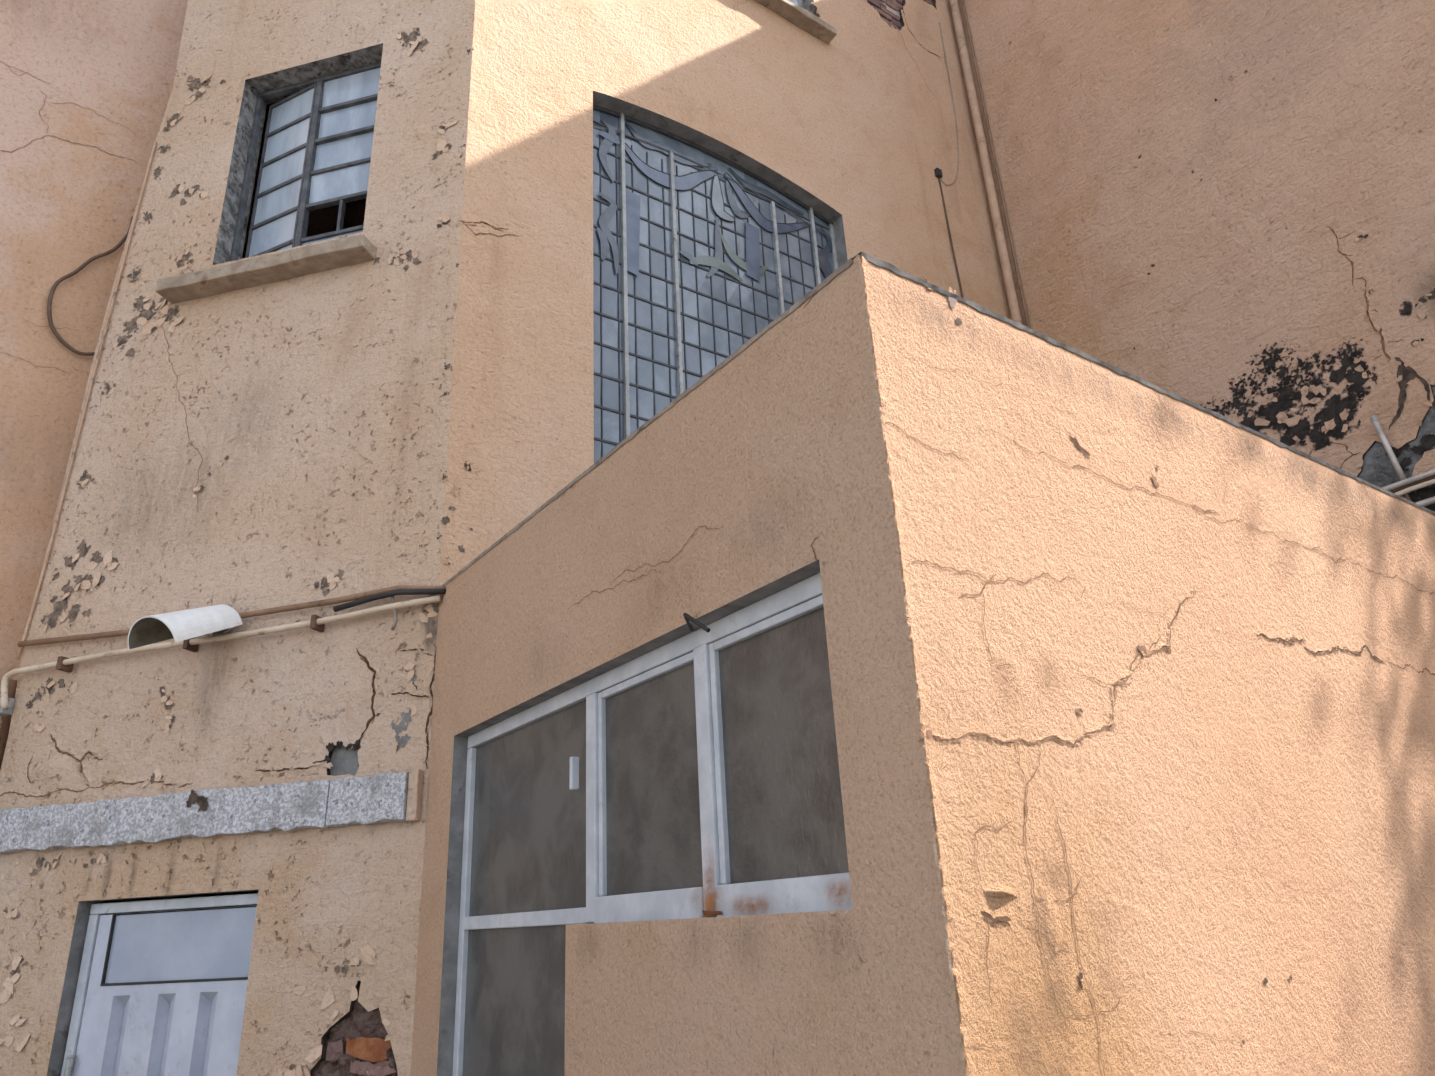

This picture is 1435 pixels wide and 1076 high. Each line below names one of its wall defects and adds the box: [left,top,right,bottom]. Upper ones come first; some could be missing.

spalling [865,0,906,30]
crack [0,61,138,164]
crack [1329,227,1401,362]
peeling [1399,288,1435,320]
crack [921,361,1116,432]
peeling [1200,336,1435,511]
crack [886,422,1433,594]
peeling [39,540,118,633]
crack [0,731,193,798]
spalling [324,739,361,776]
crack [908,560,1435,1076]
spalling [271,945,398,1076]